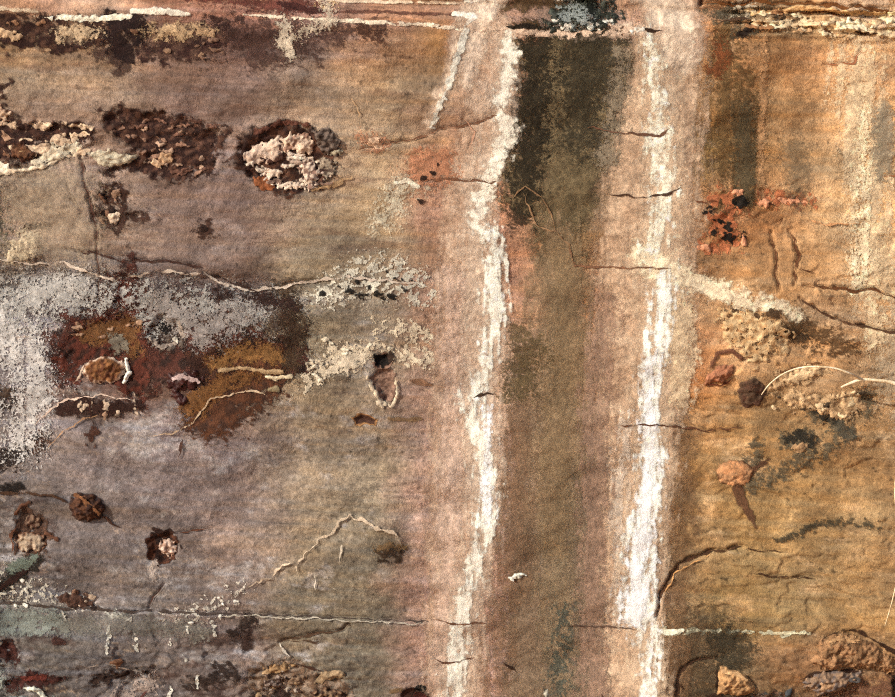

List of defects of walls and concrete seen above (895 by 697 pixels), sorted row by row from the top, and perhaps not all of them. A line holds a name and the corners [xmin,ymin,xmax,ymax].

leakage [0,6,190,23]
crack [700,0,893,65]
spalling [0,78,353,199]
leakage [0,185,277,503]
corrosion [29,251,320,458]
leakage [243,0,895,697]
spalling [245,657,354,697]